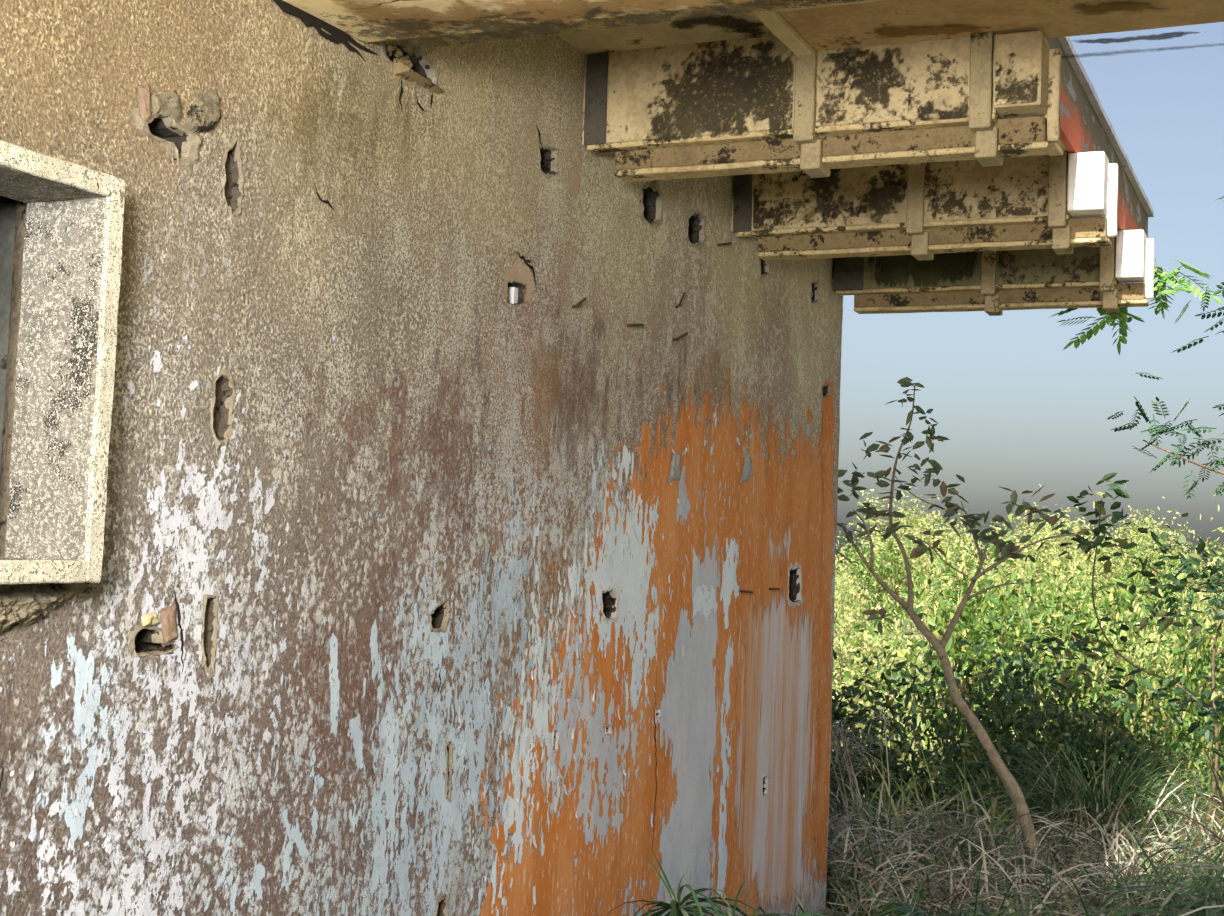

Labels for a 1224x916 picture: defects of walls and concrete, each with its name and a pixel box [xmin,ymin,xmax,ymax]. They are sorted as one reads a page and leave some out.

leakage [320,0,857,141]
leakage [821,25,990,124]
leakage [995,53,1038,105]
flaking render [131,82,221,174]
flaking render [222,137,244,223]
leakage [753,165,906,229]
leakage [927,171,1047,220]
leakage [869,252,978,287]
spalling [0,578,105,642]
flaking render [92,605,179,752]
peeling [370,365,839,916]
peeling [349,712,366,770]